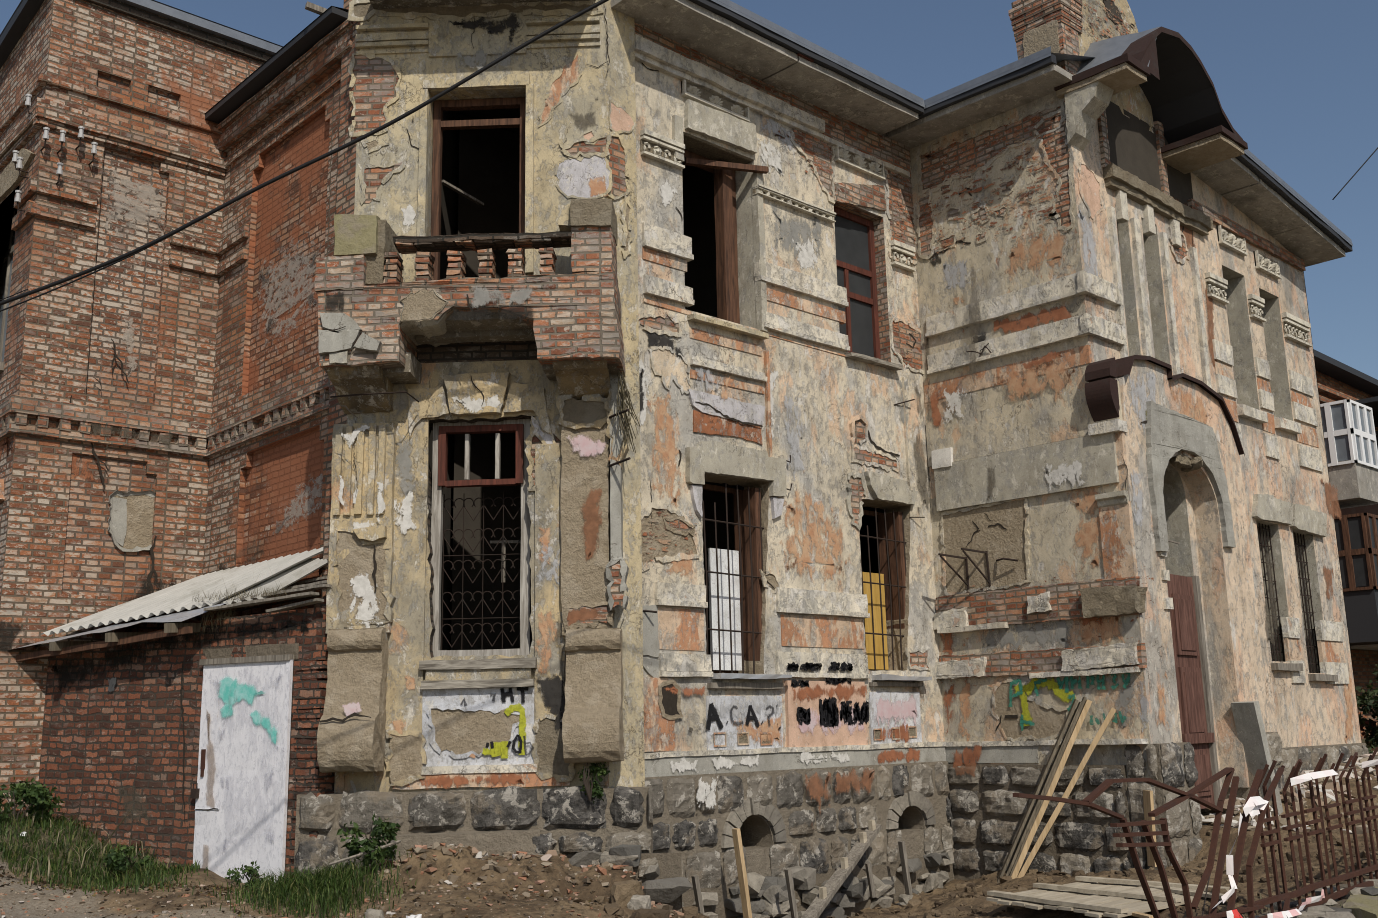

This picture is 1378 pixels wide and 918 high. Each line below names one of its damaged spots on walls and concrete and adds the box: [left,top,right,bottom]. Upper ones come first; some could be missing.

spalling [348,53,407,206]
peeling [538,52,582,128]
peeling [555,100,635,259]
spalling [884,102,1103,278]
peeling [338,475,358,505]
peeling [339,425,370,448]
spalling [330,481,417,625]
spalling [384,311,782,789]
peeling [992,352,1075,407]
peeling [1058,567,1154,646]